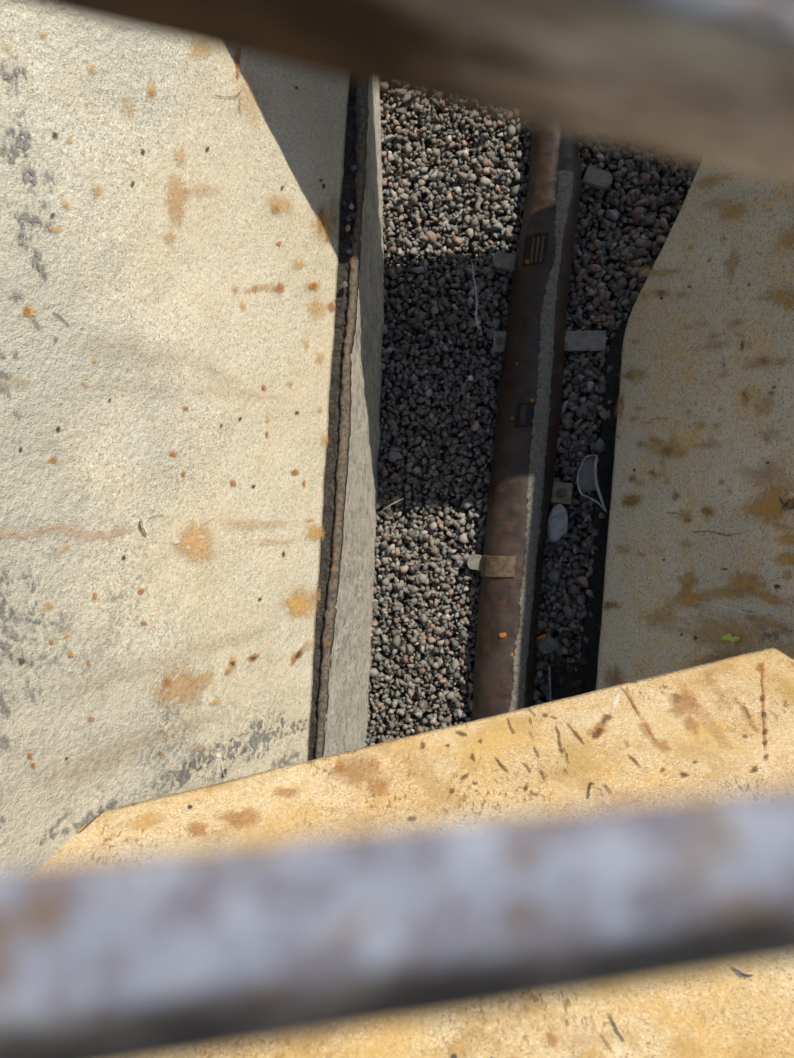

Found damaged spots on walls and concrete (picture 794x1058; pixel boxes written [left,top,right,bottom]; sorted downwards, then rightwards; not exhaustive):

corrosion [166,172,187,224]
corrosion [172,516,214,561]
corrosion [743,486,794,580]
corrosion [284,589,314,618]
corrosion [713,572,783,606]